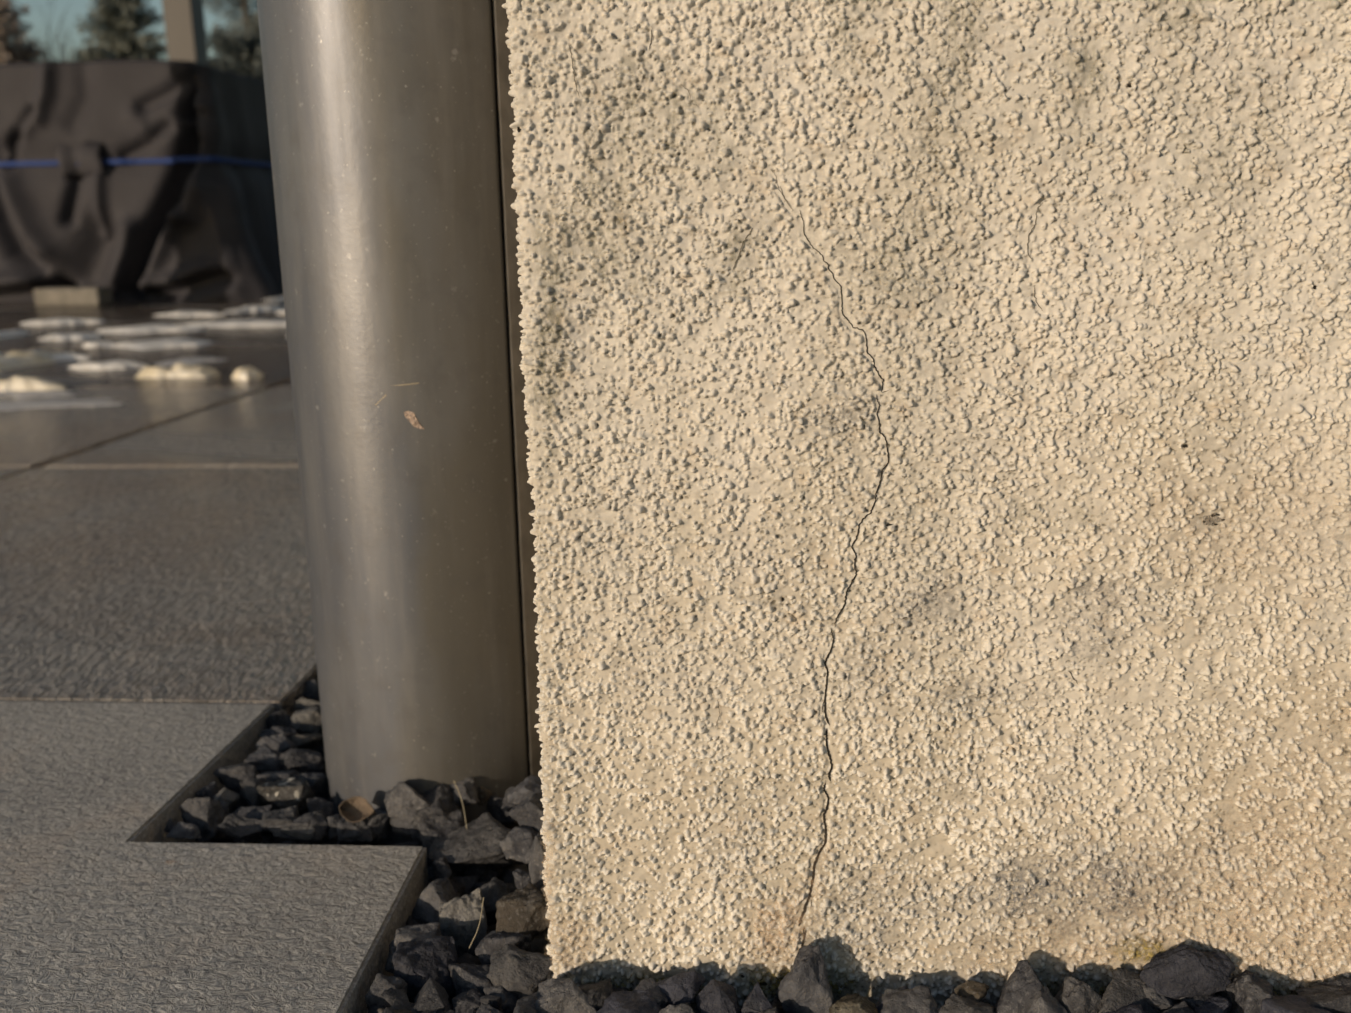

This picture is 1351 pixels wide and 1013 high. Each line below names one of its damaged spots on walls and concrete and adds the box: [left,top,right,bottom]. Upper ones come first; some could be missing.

crack [770,169,889,960]